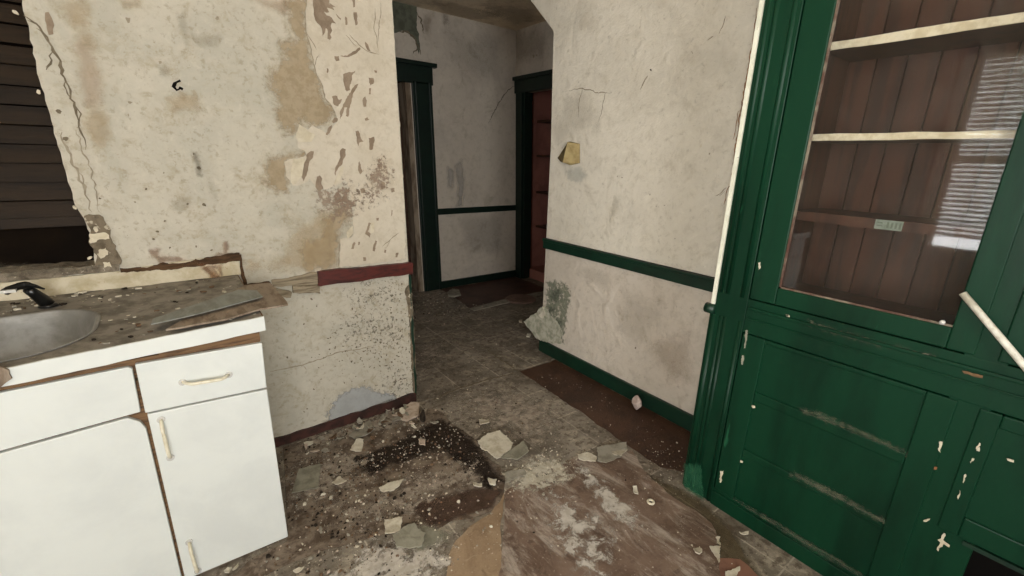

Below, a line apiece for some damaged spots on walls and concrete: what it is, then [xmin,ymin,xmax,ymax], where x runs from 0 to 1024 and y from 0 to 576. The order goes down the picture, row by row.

crack [23,15,99,212]
flaking render [72,206,122,268]
leakage [266,152,305,191]
leakage [268,0,335,133]
peeling [284,0,420,267]
crack [571,88,607,118]
leakage [234,279,643,576]